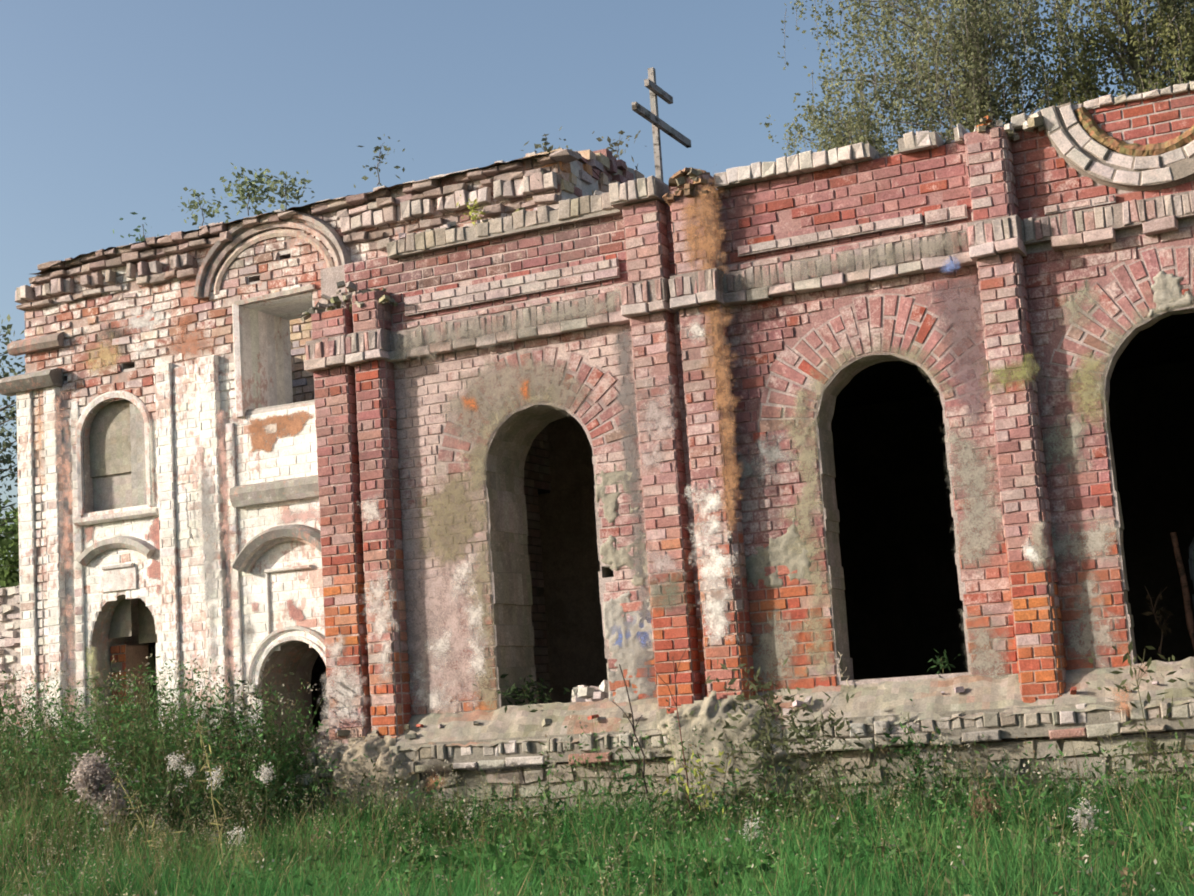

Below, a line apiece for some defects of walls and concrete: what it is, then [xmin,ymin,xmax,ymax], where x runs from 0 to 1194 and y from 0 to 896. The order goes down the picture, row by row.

peeling [248,411,313,452]
leakage [420,473,475,562]
leakage [696,493,728,579]
leakage [706,594,727,636]